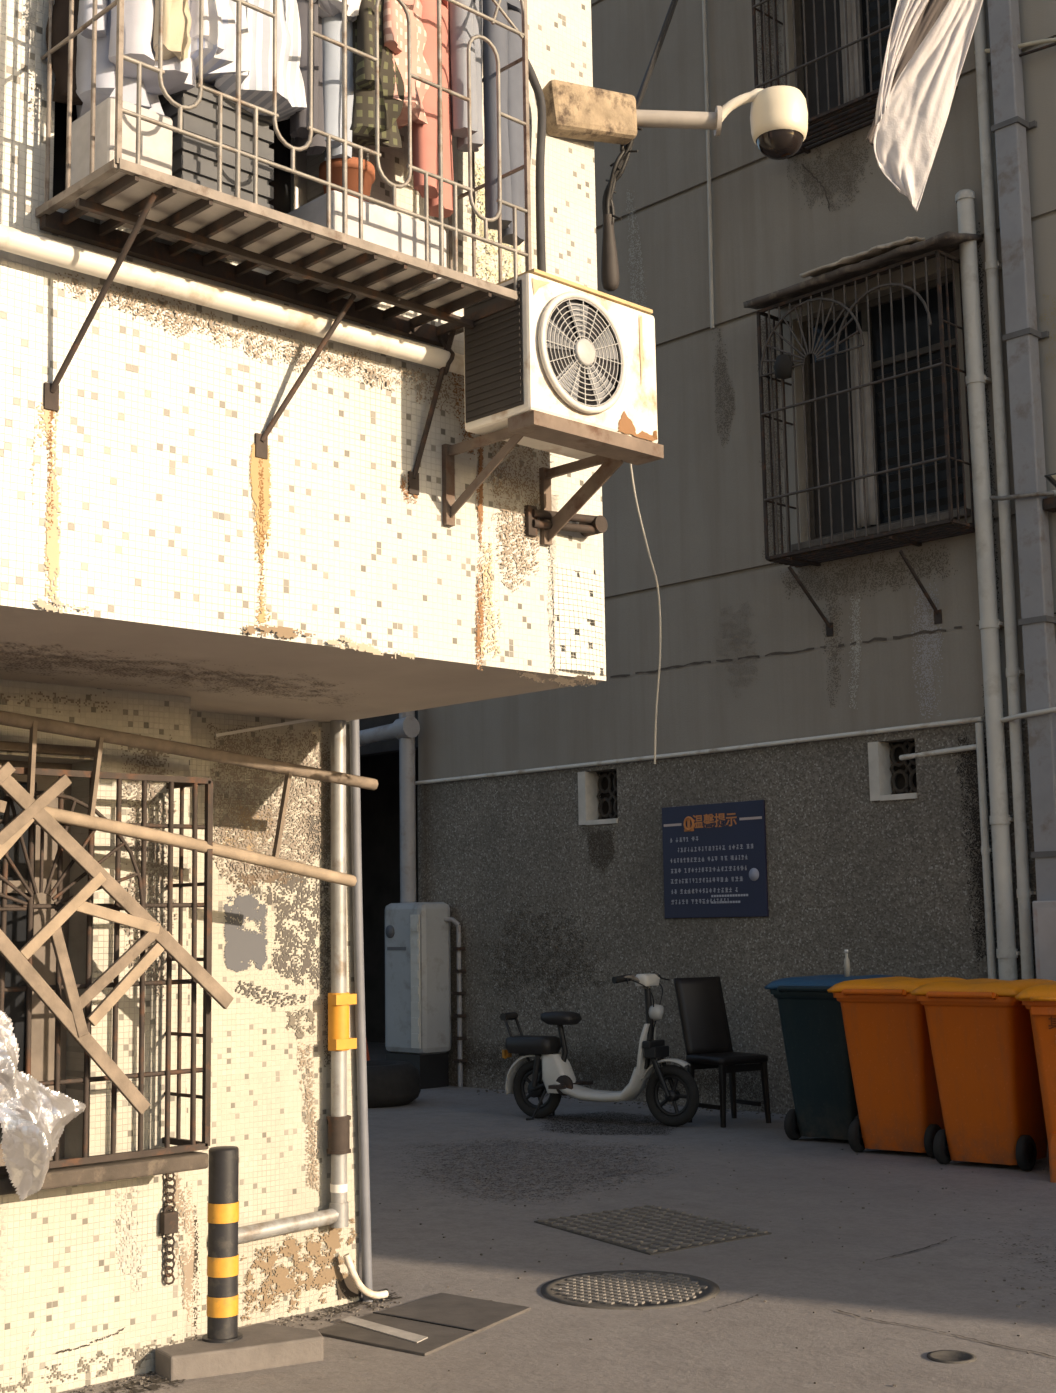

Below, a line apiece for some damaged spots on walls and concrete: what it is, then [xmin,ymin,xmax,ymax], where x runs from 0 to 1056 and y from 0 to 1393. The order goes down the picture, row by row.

rust [30,401,62,602]
rust [250,443,271,624]
leakage [53,272,559,676]
rust [475,435,502,670]
leakage [757,316,958,719]
peeling [229,861,331,1008]
spalling [336,1274,361,1300]